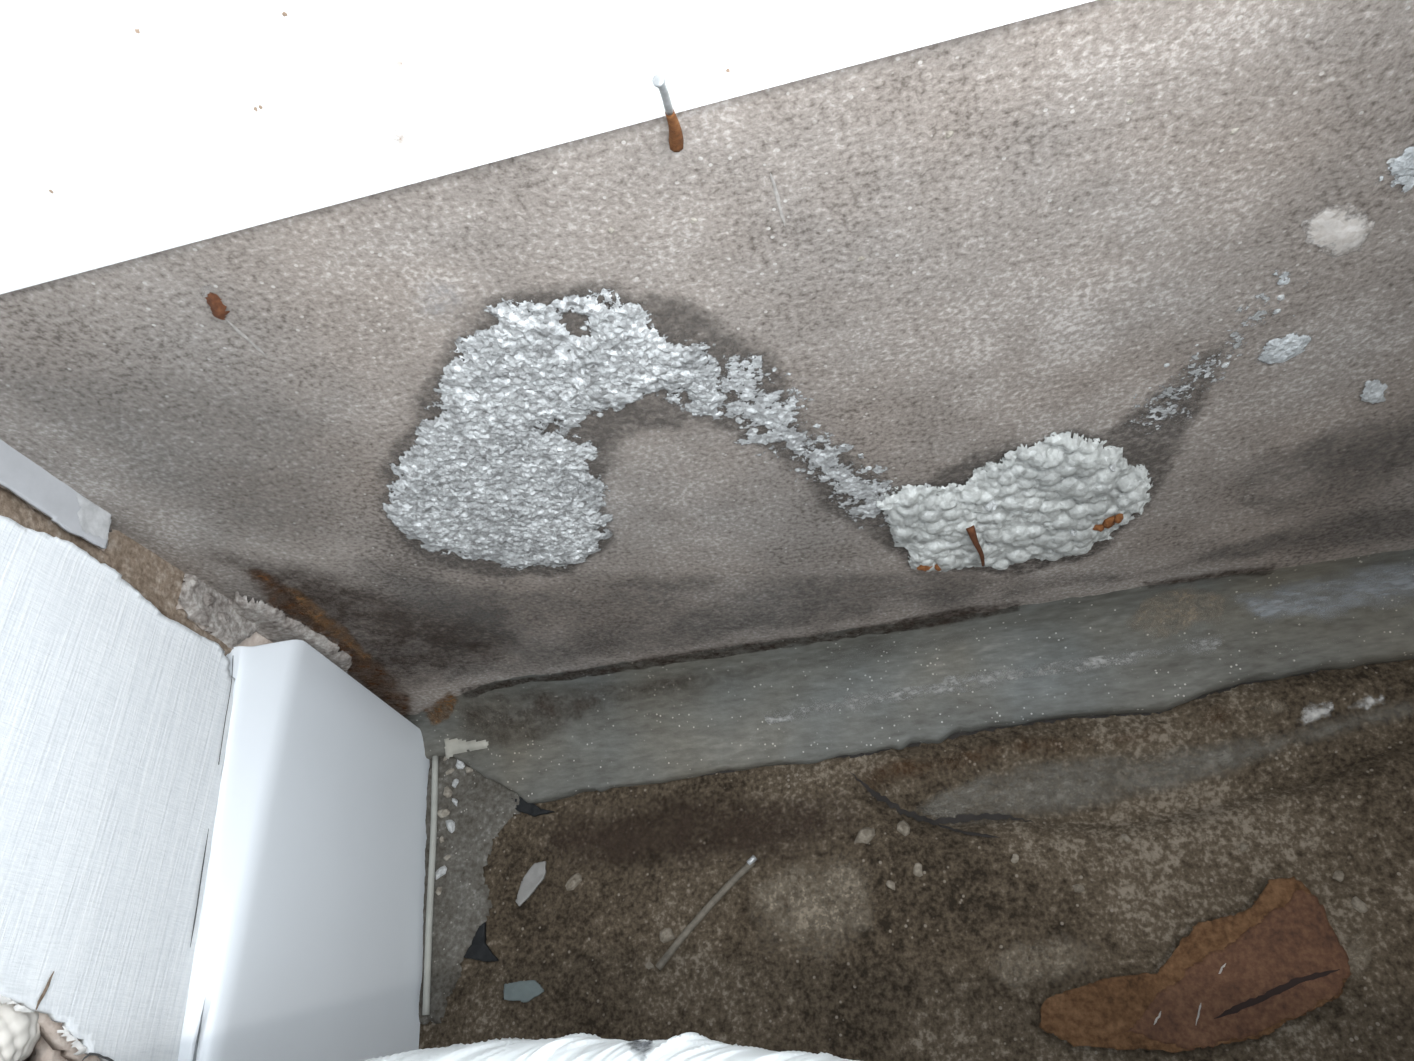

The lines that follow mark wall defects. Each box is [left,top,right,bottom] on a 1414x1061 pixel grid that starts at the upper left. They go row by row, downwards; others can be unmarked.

rust [205,292,267,357]
leakage [1249,569,1414,616]
leakage [765,651,1141,724]
leakage [1304,706,1333,721]